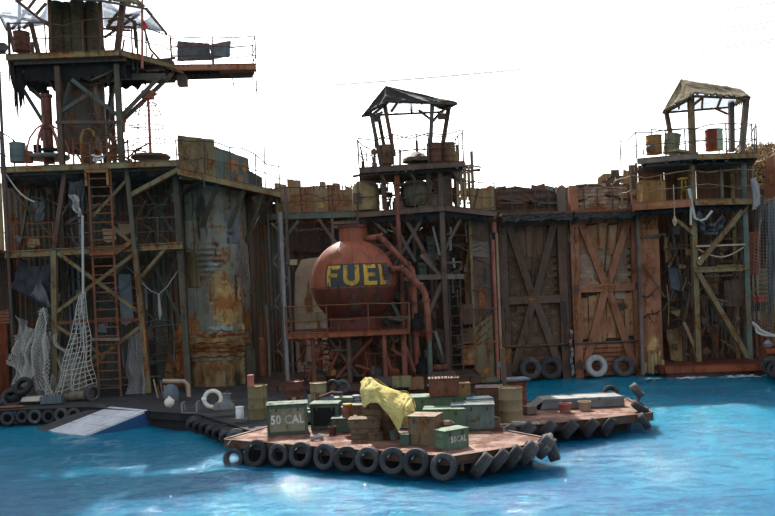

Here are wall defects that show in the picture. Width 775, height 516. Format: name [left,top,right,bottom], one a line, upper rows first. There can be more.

rust [206,280,252,343]